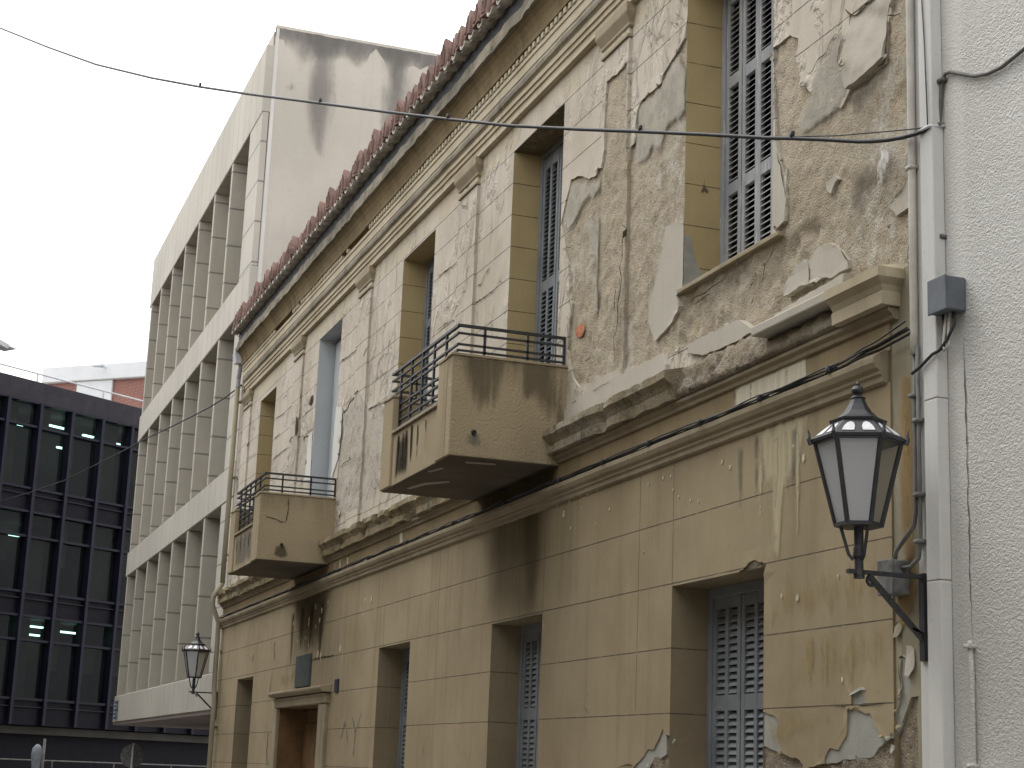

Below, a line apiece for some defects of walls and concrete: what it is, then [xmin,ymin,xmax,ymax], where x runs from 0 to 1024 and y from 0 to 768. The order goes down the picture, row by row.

water stain [275,27,437,68]
spalling [562,0,909,400]
water stain [395,420,426,475]
water stain [756,414,808,556]
crack [963,349,972,625]
water stain [291,590,327,650]
peeling [635,730,676,768]
peeling [764,620,918,768]